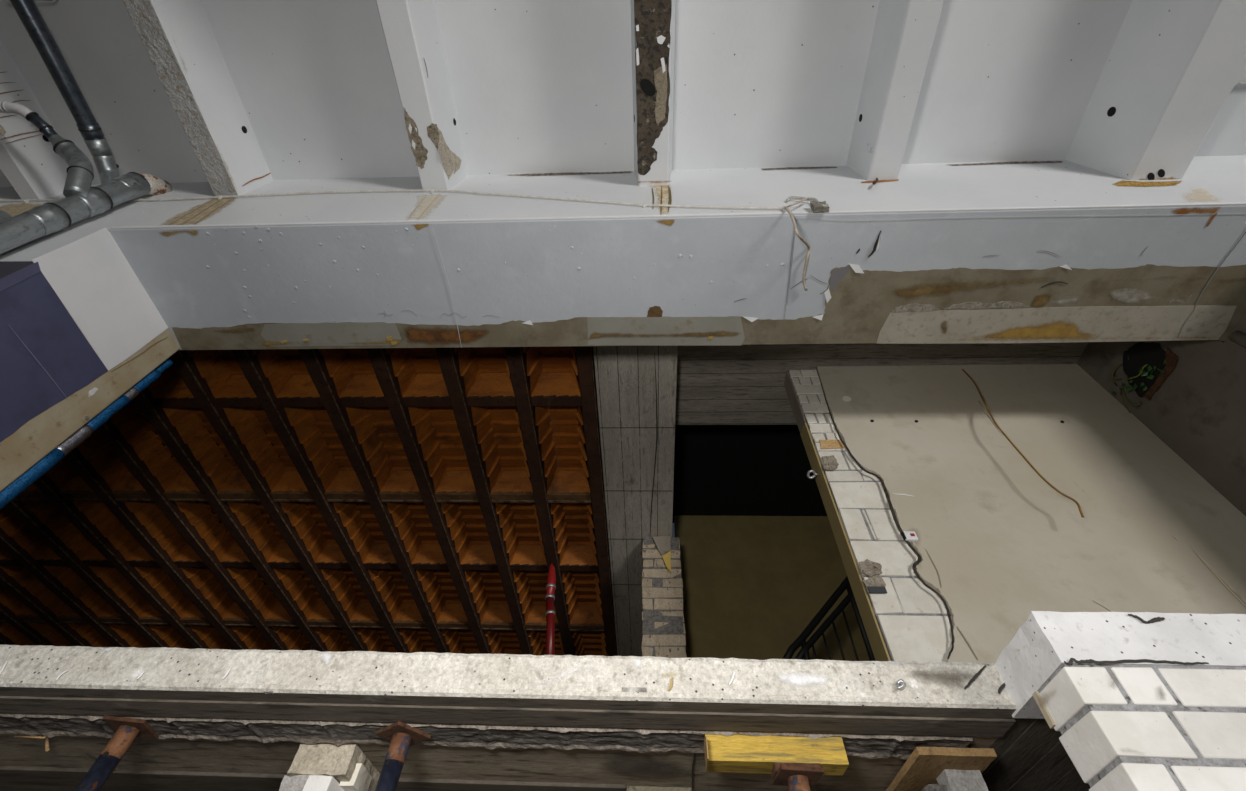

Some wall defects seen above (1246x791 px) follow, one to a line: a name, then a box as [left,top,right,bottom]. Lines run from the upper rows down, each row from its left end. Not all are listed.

peeling [403,107,461,179]
peeling [634,0,672,175]
corrosion [1174,190,1219,227]
peeling [172,263,1246,400]